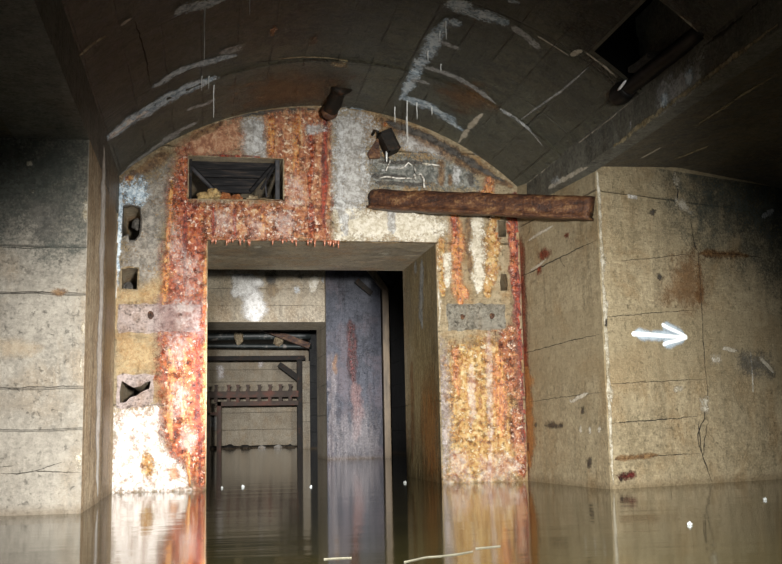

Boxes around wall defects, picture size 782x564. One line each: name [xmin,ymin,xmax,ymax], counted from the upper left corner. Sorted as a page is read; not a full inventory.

water stain [399,0,539,143]
spalling [116,373,154,409]
water stain [96,45,316,497]
rust [125,108,340,490]
rust [346,320,358,383]
rust [405,214,535,483]
rust [616,471,637,482]
crack [509,172,761,481]